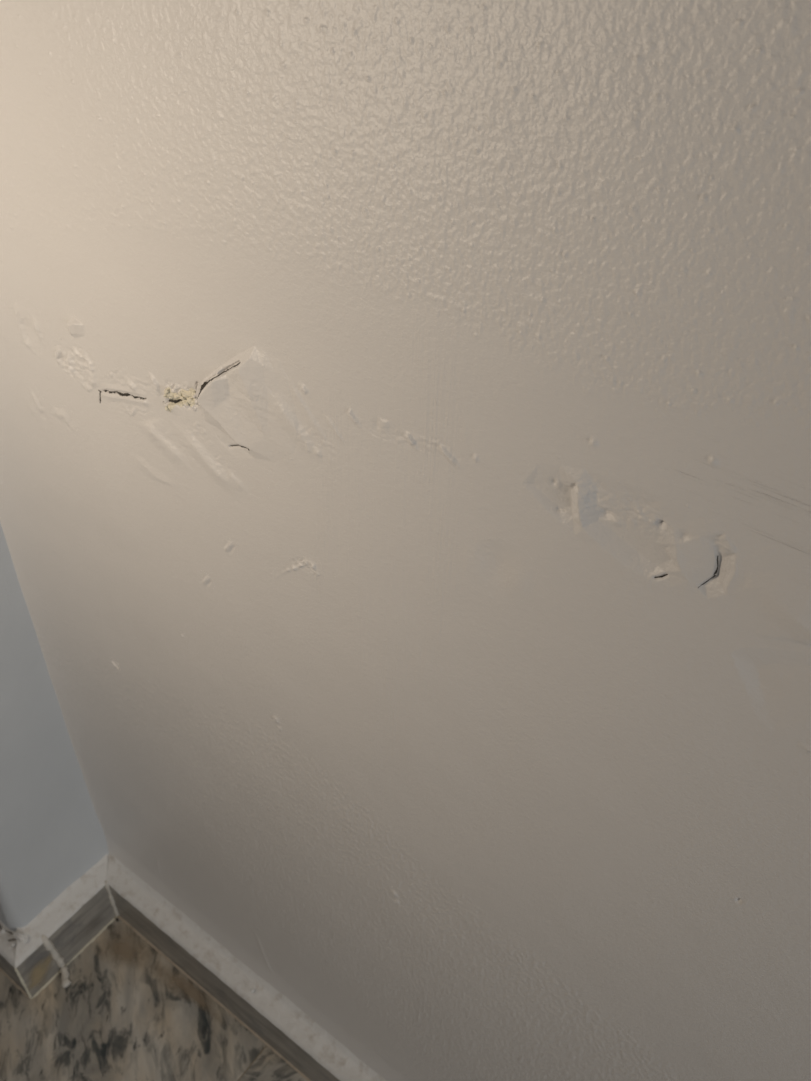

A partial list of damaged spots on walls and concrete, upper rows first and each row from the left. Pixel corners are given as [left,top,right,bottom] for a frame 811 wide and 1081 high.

crack [99,362,240,403]
peeling [94,340,347,481]
flaking render [507,459,743,606]